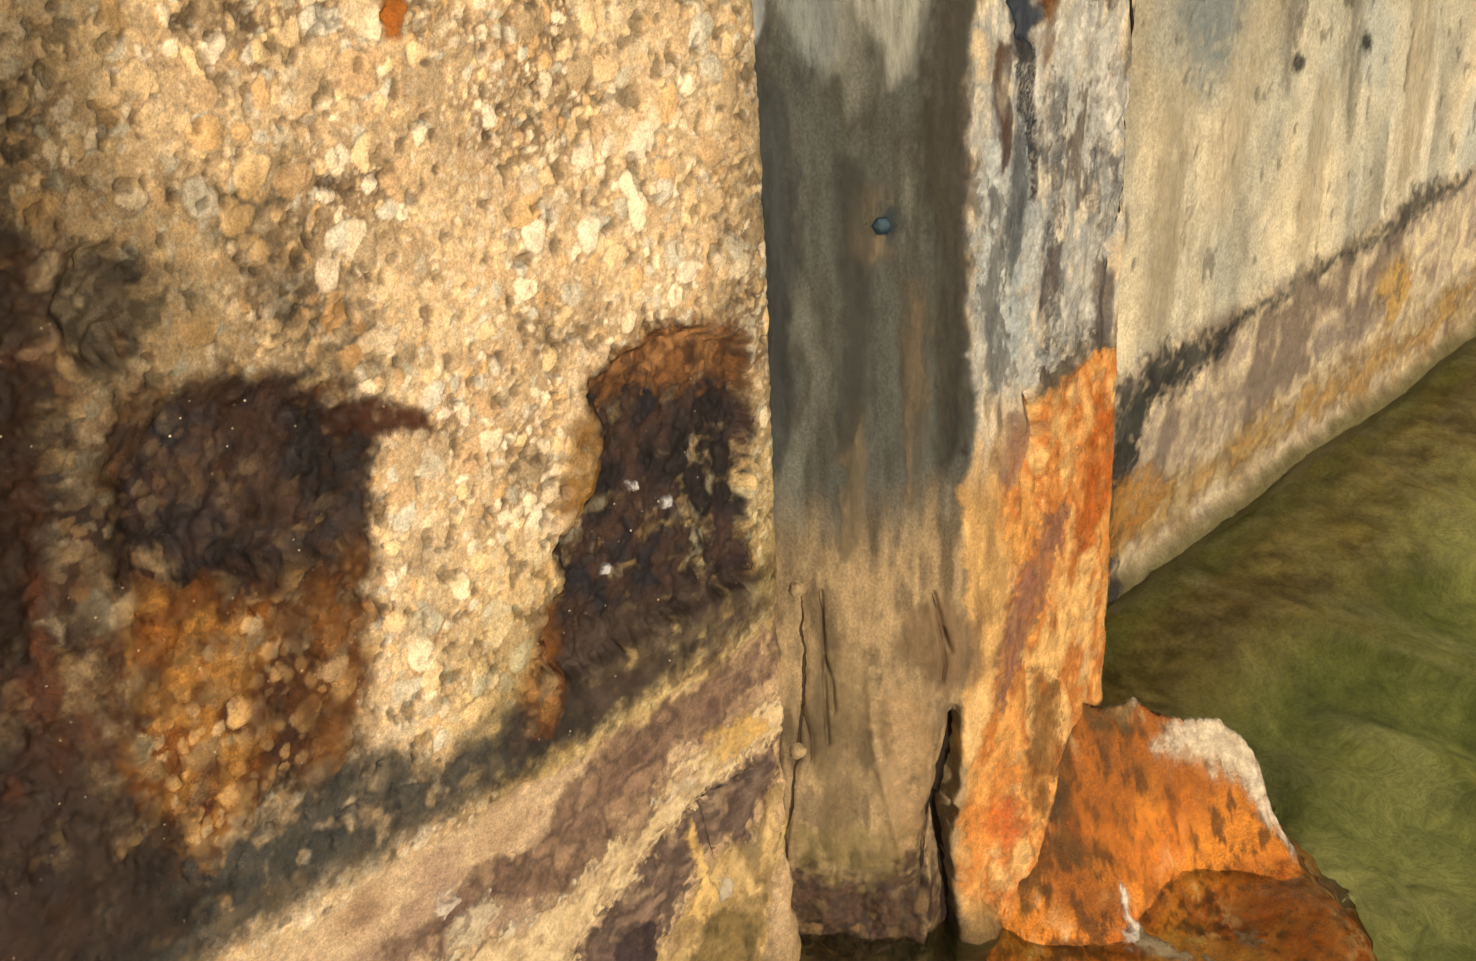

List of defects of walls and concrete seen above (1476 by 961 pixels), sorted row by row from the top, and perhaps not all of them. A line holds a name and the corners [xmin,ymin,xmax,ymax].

damp [752,0,1131,461]
rust [1038,0,1060,22]
damp [1106,75,1472,603]
rust [0,230,432,961]
crack [784,595,832,852]
crack [919,707,953,923]
rust [956,347,1117,919]